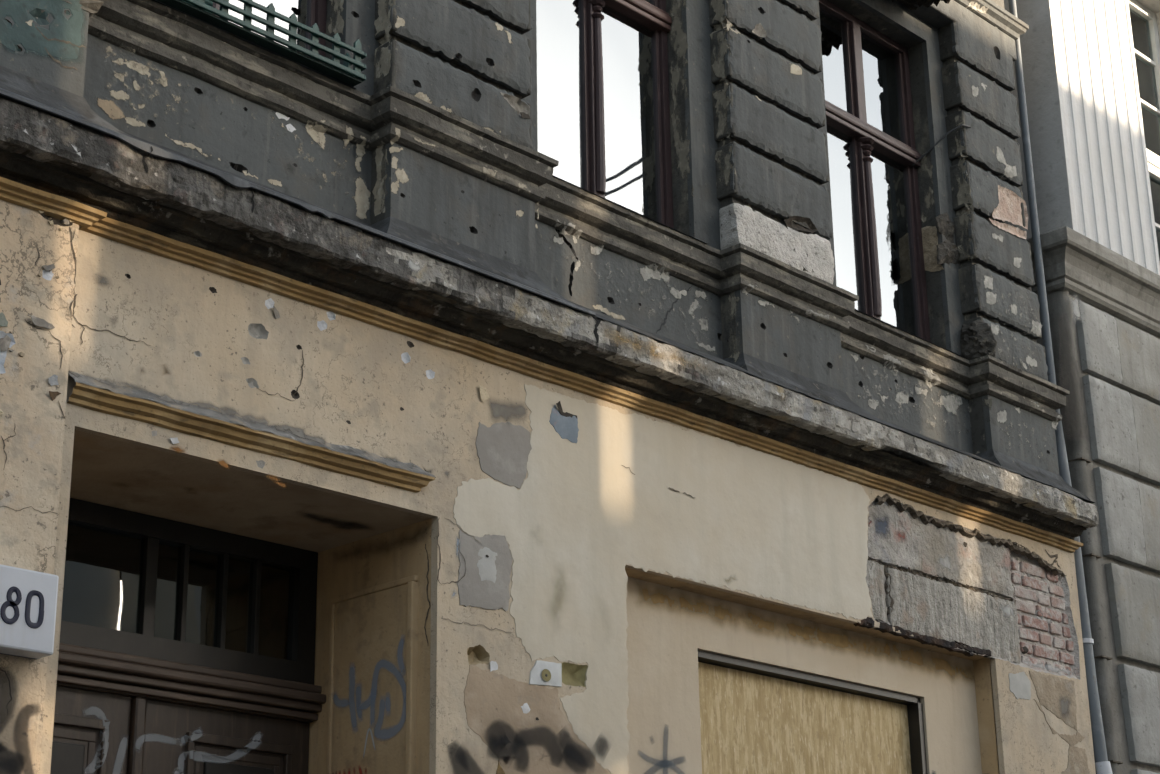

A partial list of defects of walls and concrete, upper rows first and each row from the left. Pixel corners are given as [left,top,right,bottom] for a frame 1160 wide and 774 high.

peeling [97,48,181,127]
peeling [323,125,409,219]
spalling [989,146,1029,243]
crack [25,222,151,368]
crack [555,229,578,296]
spalling [728,203,834,284]
crack [257,350,304,401]
spalling [475,385,532,489]
peeling [549,401,579,443]
spalling [457,530,512,611]
flaking render [865,493,1090,774]
flaking render [464,644,610,774]